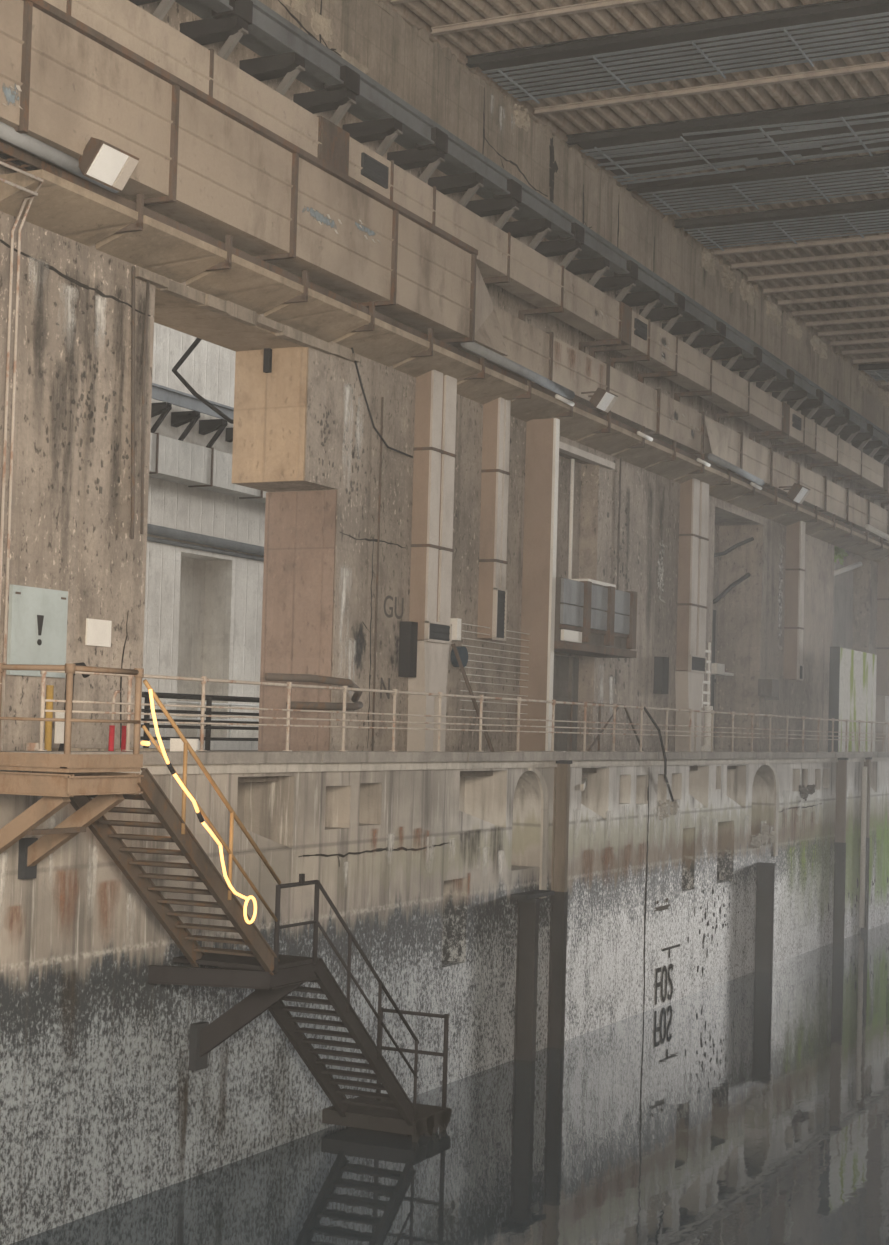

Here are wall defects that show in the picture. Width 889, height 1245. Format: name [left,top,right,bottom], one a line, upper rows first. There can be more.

crack [482,87,619,247]
leakage [34,262,45,369]
leakage [52,278,105,473]
leakage [117,299,148,420]
crack [298,842,452,867]